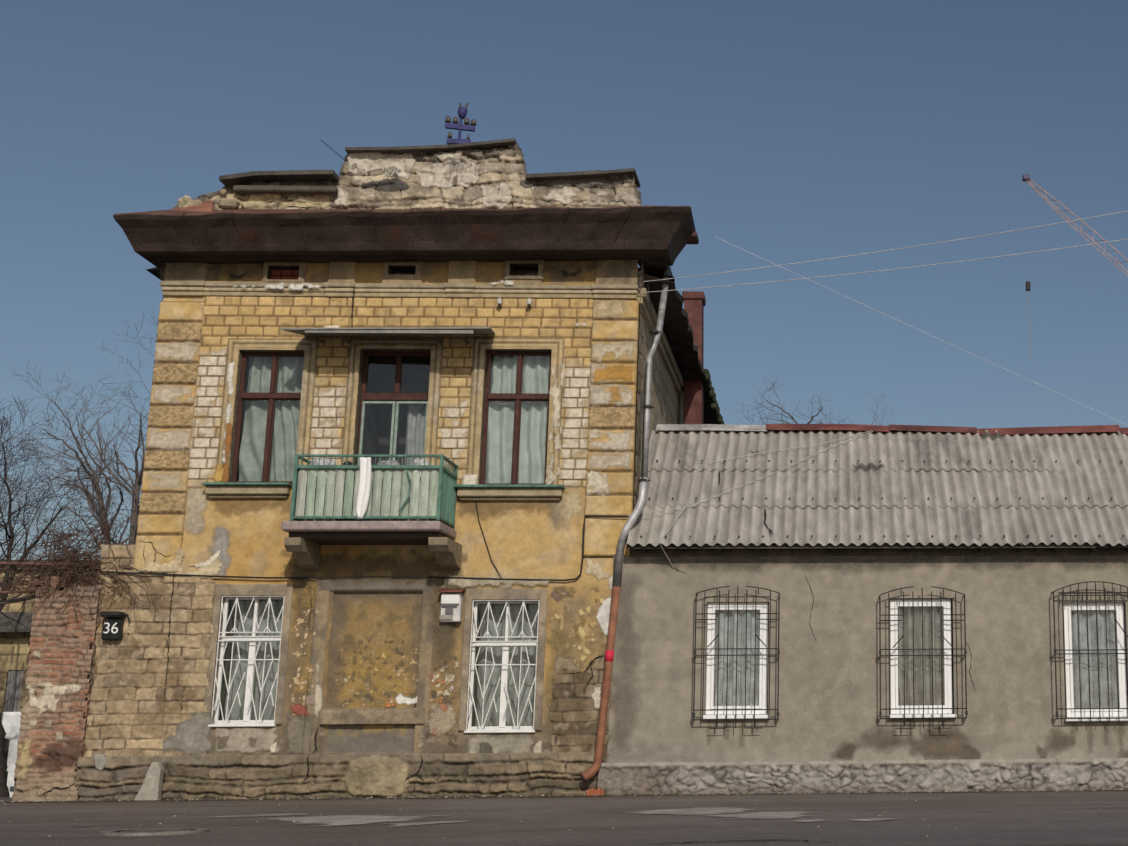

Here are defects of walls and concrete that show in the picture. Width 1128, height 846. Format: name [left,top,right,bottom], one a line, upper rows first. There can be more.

peeling [148,342,235,534]
spalling [16,543,228,780]
peeling [270,609,322,755]
spalling [335,640,459,748]
spalling [443,558,613,763]
damp [836,745,855,759]
damp [915,727,980,759]